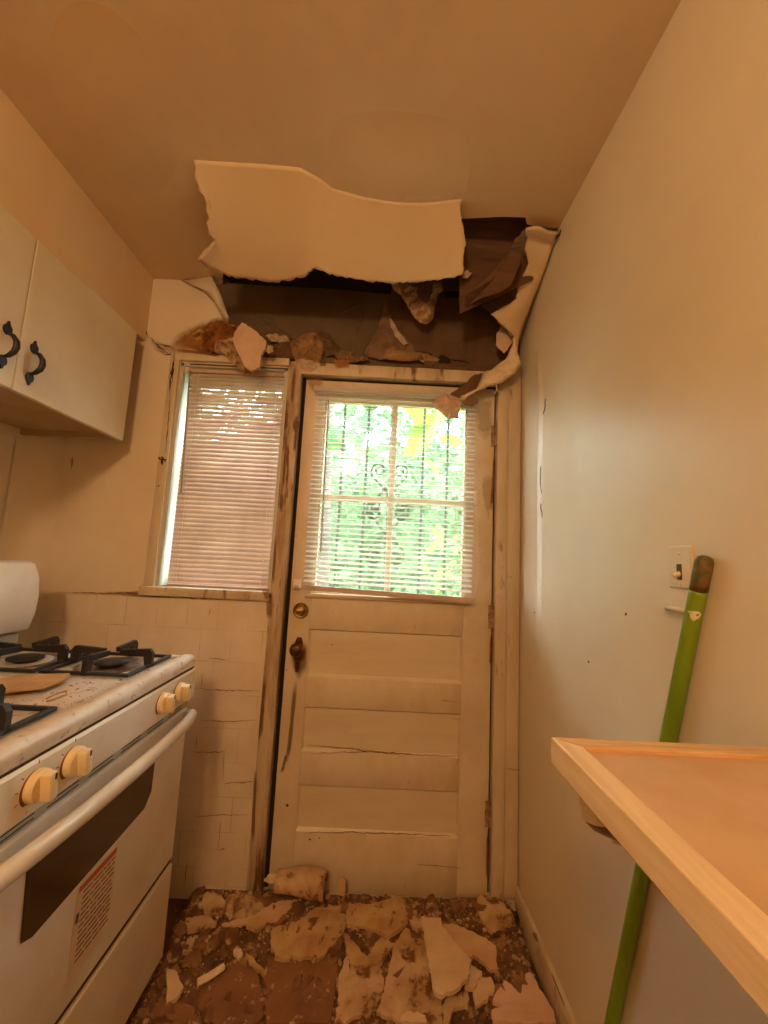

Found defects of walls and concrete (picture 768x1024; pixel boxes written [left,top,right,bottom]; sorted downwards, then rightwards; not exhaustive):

spalling [181,277,229,323]
crack [193,720,252,784]